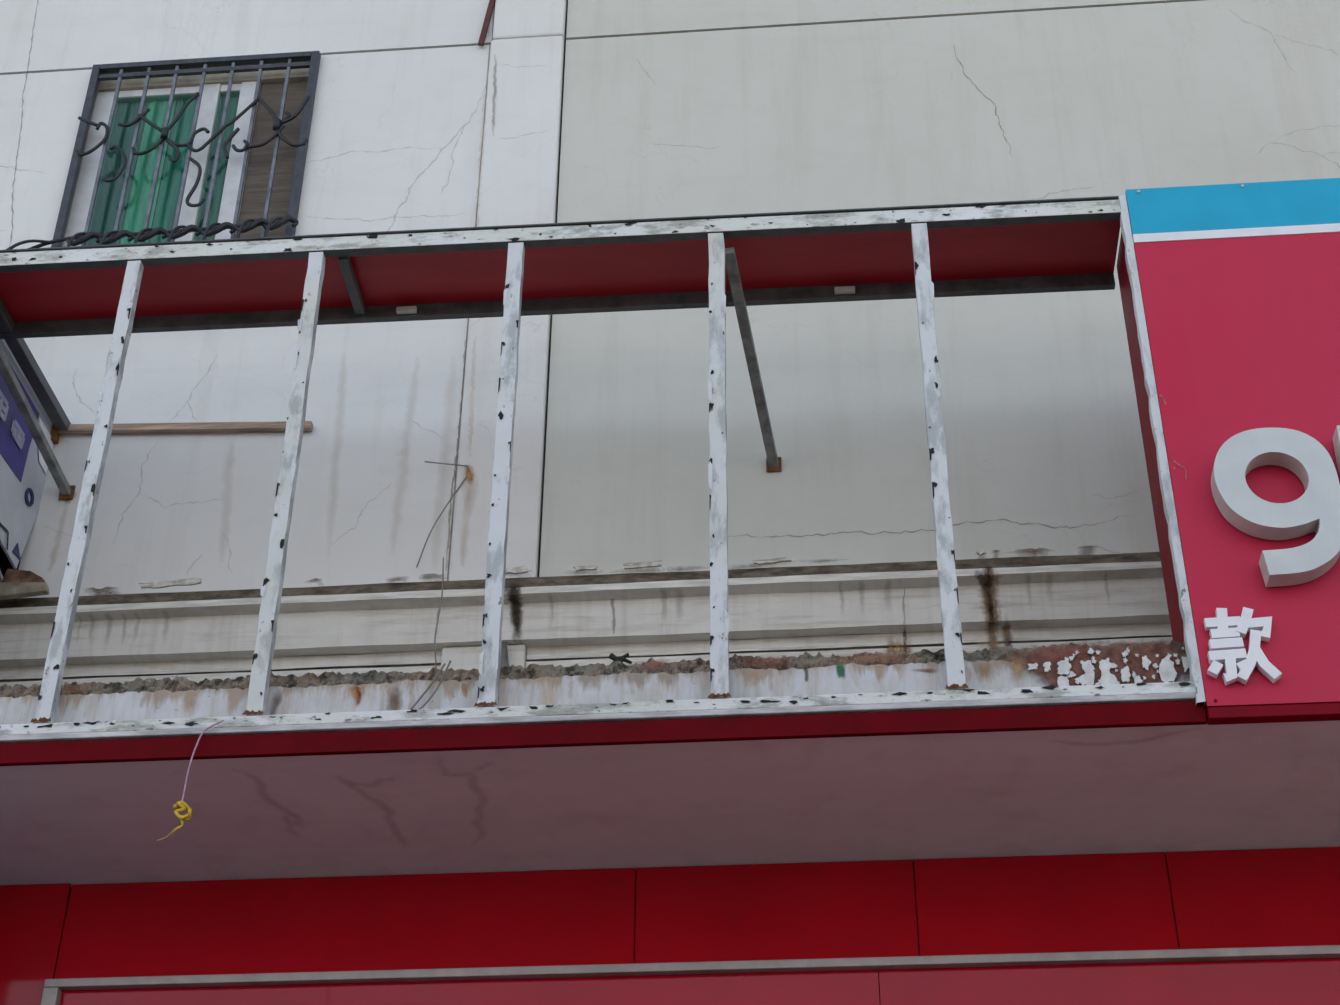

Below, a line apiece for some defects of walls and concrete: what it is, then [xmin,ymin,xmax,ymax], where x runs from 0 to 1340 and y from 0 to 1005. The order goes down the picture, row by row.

peeling [1010,641,1190,686]
rust [389,692,399,710]